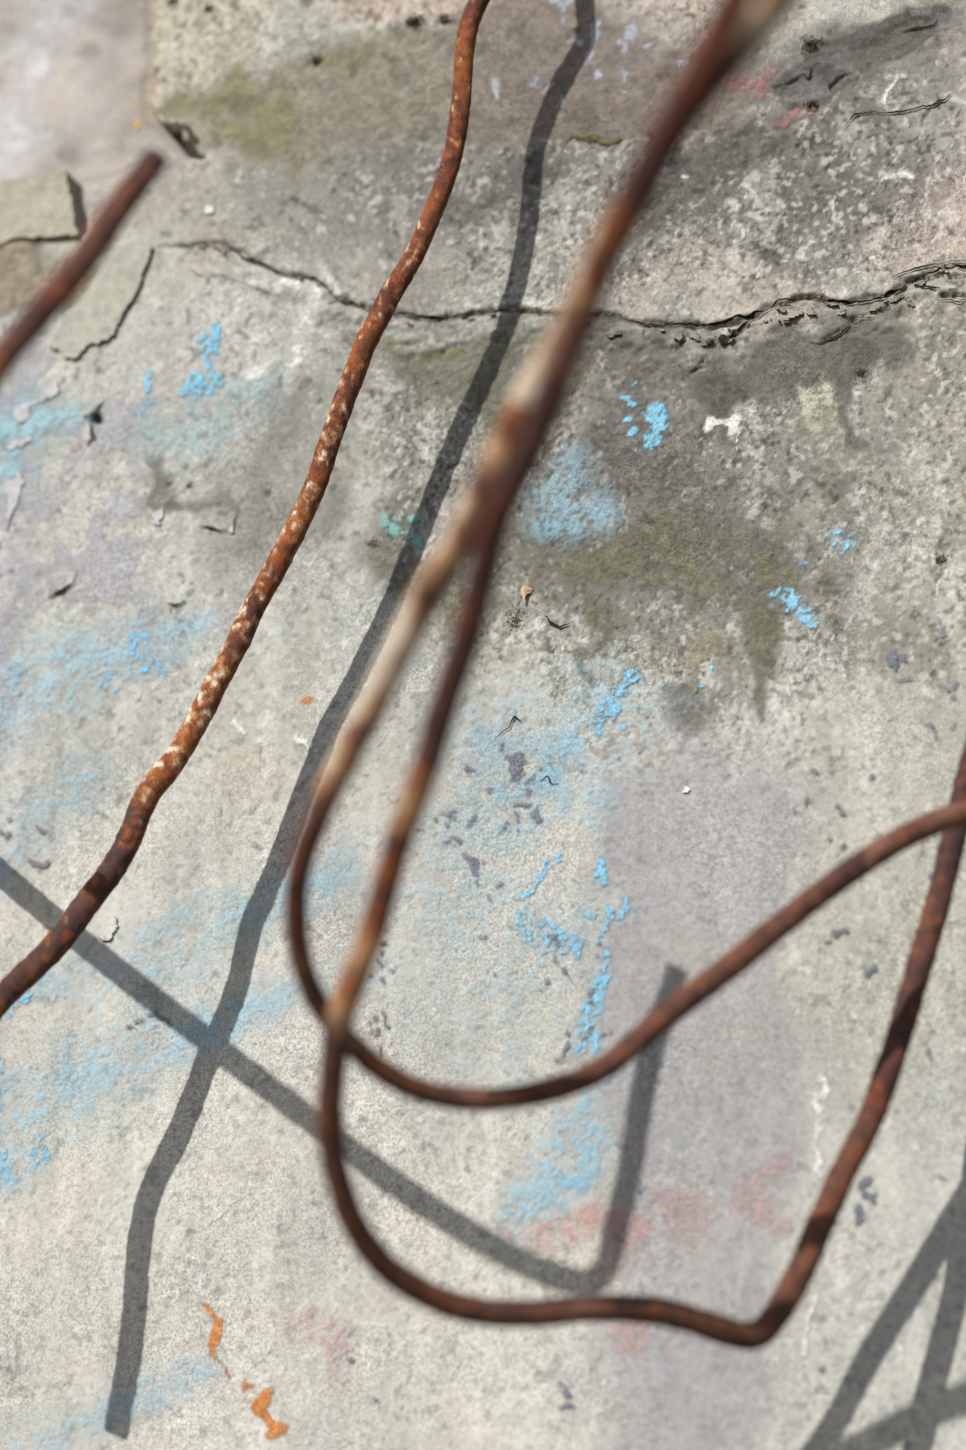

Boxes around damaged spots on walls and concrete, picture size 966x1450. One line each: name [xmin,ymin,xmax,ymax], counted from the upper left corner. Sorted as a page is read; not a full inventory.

crack [156,242,557,326]
crack [601,260,966,372]
leakage [392,324,545,423]
leakage [572,309,913,519]
spalling [0,0,490,1020]
leakage [808,499,851,550]
leakage [575,605,612,687]
spalling [284,0,966,1350]
leakage [732,596,781,716]
peeling [125,1011,171,1028]
rust [203,1303,287,1438]
peeling [559,1381,574,1409]